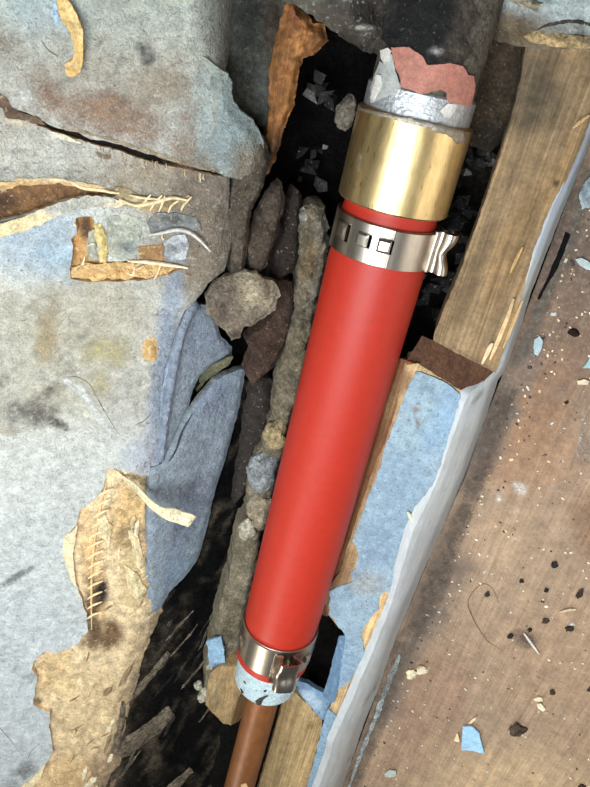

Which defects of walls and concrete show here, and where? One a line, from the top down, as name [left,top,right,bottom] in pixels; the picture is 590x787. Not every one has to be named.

crack [0,93,223,182]
peeling [22,466,196,787]